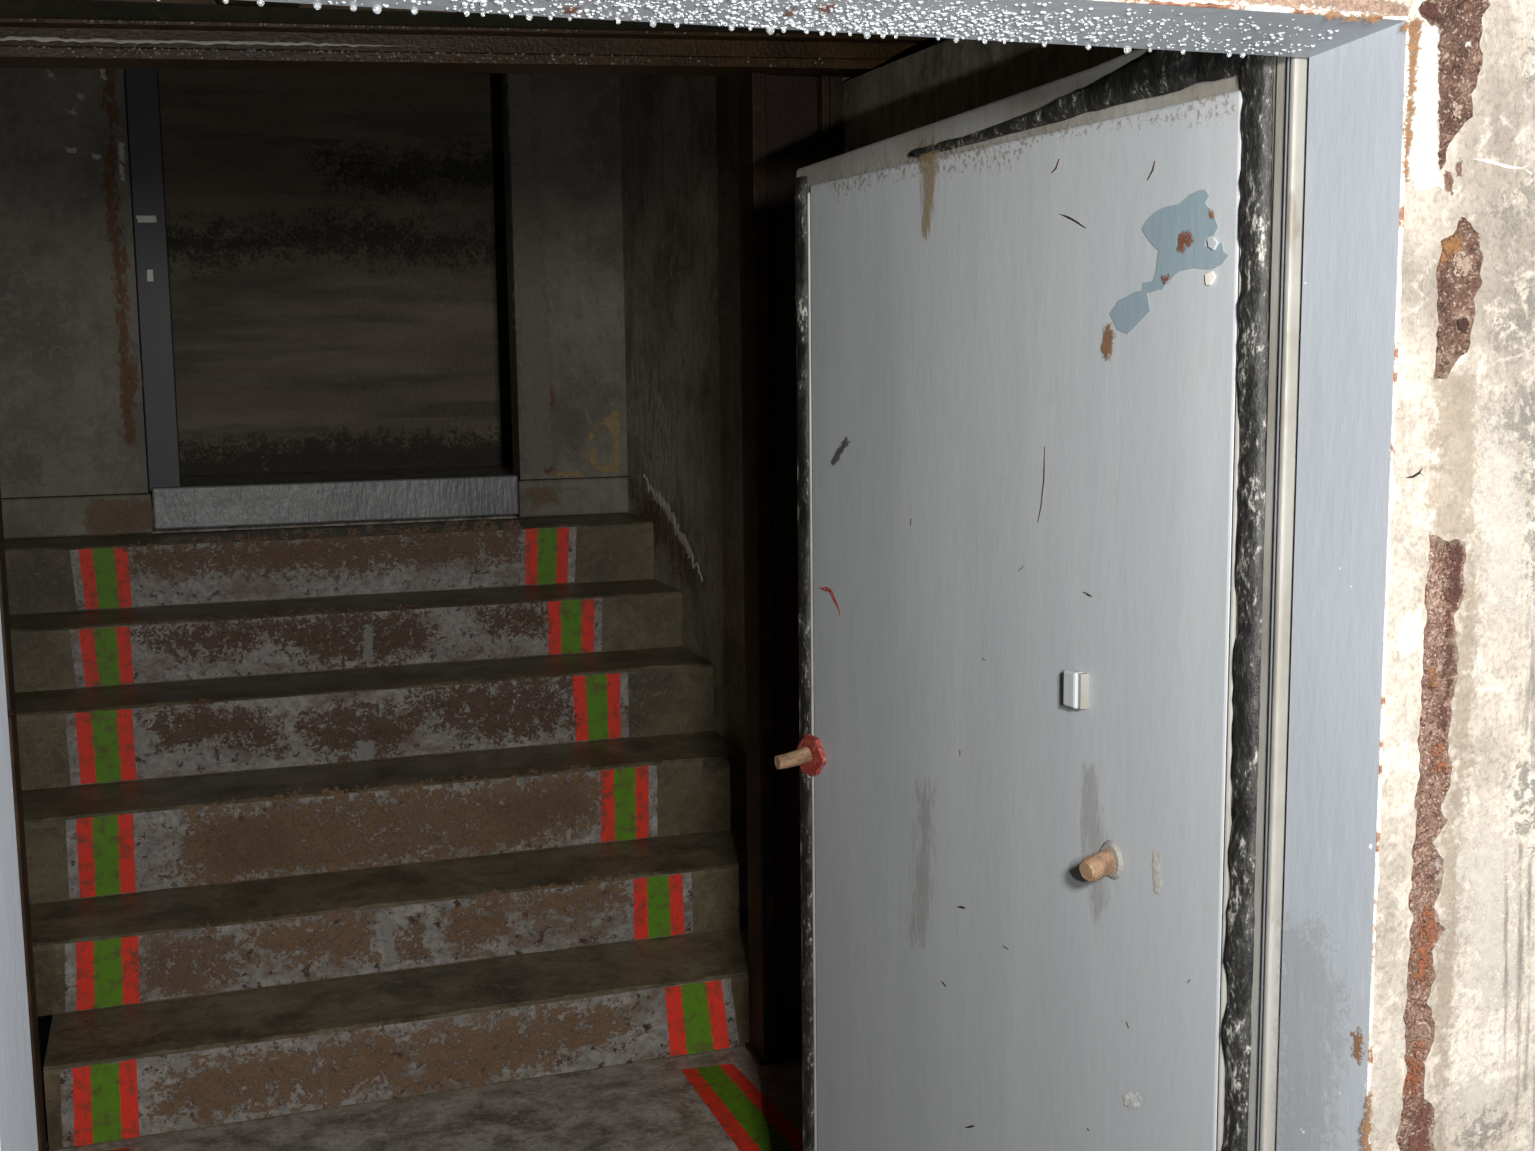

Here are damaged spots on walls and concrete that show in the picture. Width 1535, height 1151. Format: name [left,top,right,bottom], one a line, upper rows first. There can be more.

peeling [65,141,126,182]
corrosion [920,138,938,236]
spalling [1204,0,1490,195]
peeling [1100,190,1229,361]
spalling [1433,217,1484,380]
spalling [1396,535,1466,1151]